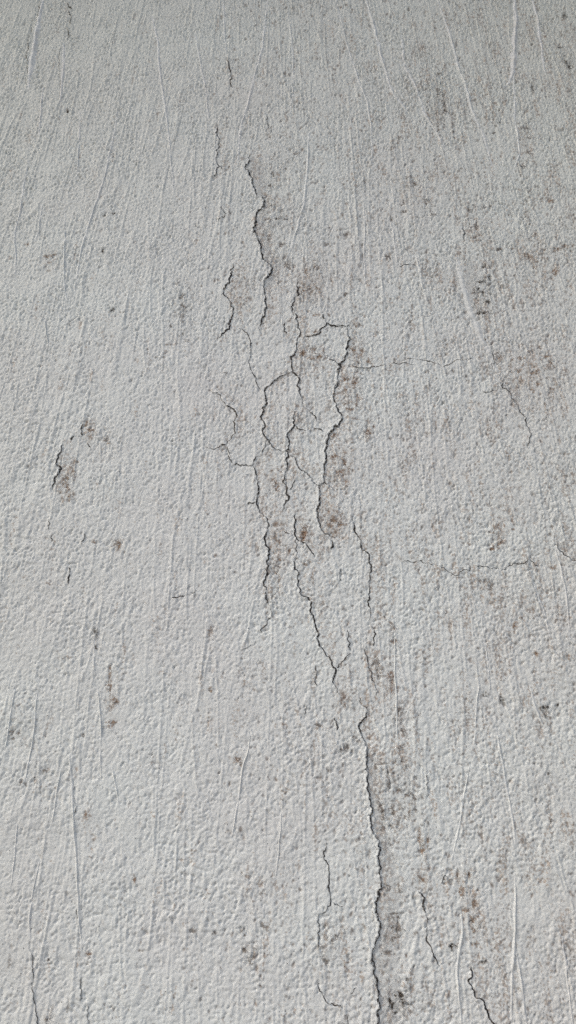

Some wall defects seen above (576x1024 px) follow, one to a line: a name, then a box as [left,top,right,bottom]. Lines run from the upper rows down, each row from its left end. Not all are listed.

crack [206,127,532,1024]